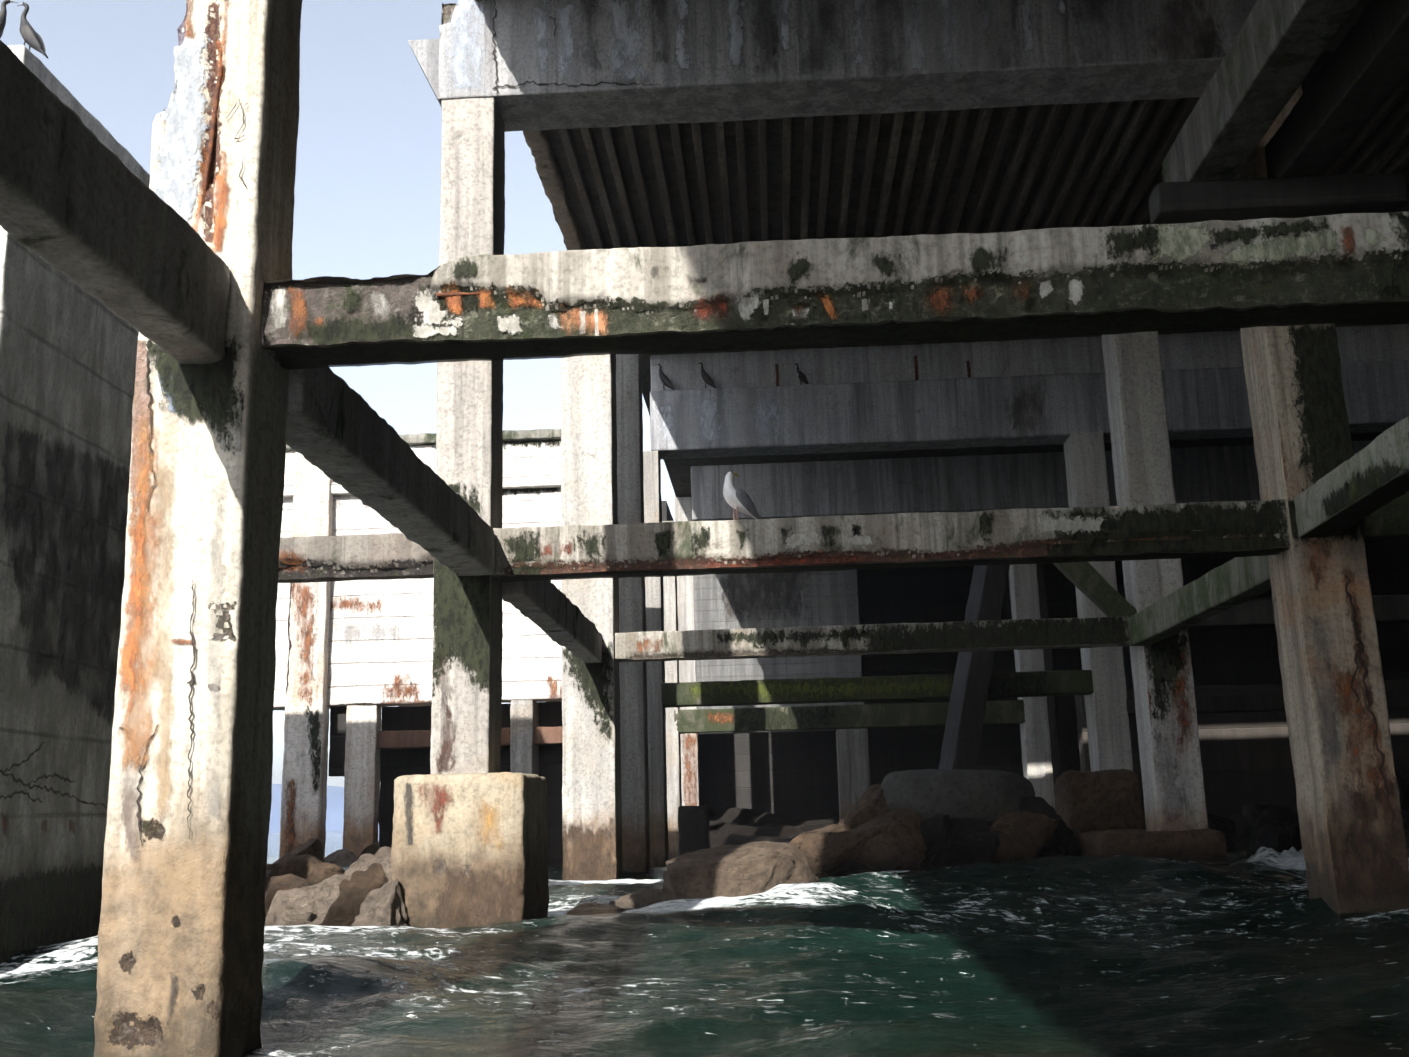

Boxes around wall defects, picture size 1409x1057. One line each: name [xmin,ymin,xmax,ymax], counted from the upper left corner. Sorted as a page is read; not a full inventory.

peeling [154,0,226,243]
crack [492,0,661,94]
rust [442,285,462,315]
rust [479,289,491,308]
damp [1039,279,1084,305]
damp [3,423,130,723]
crack [0,579,196,842]
rust [118,420,161,769]
rust [278,551,381,706]
crack [1344,574,1395,832]
rust [284,780,296,855]
rust [419,786,450,833]